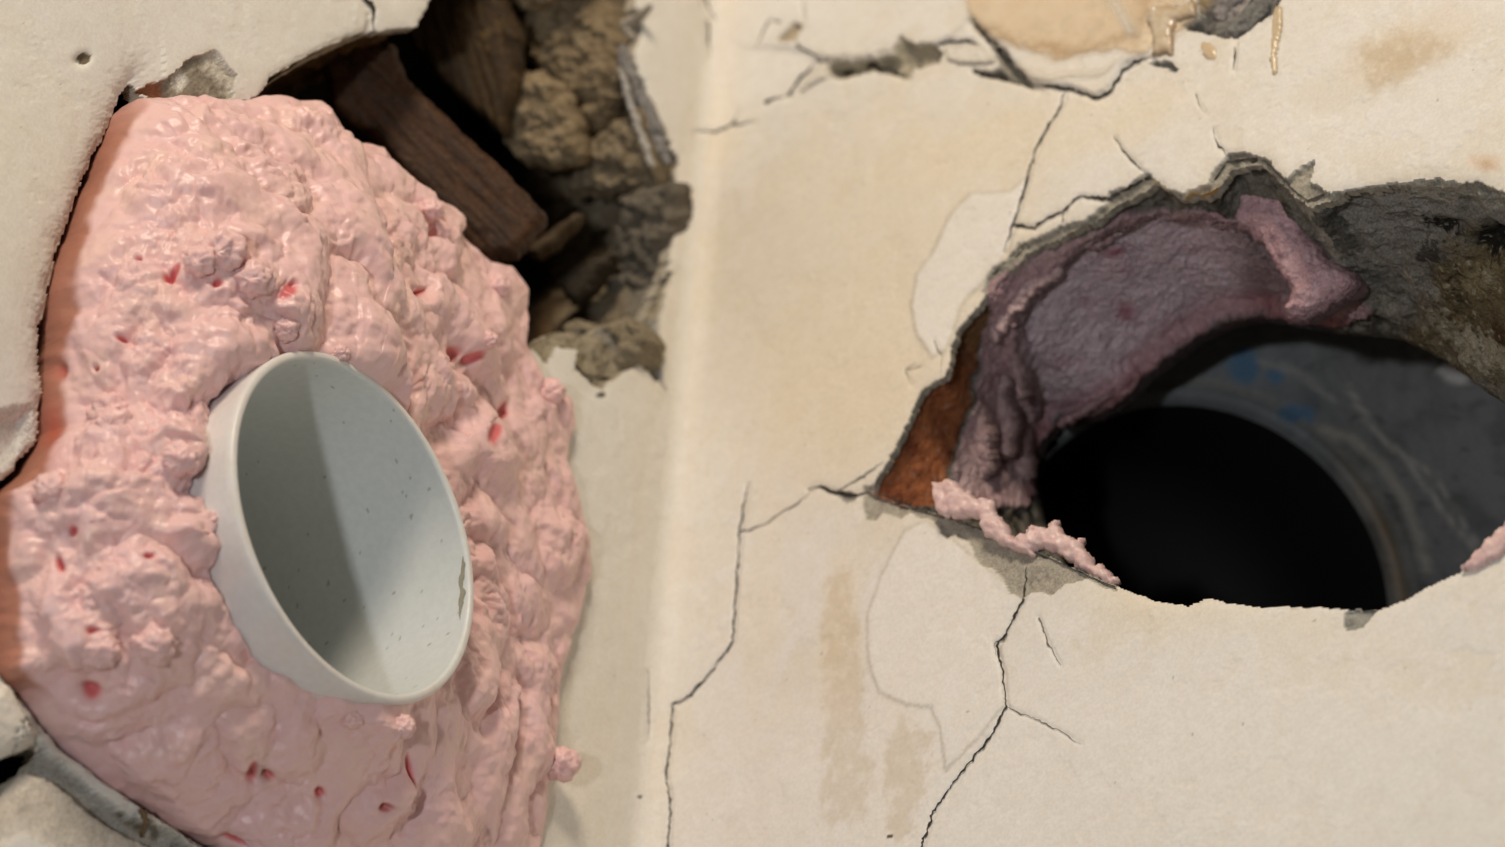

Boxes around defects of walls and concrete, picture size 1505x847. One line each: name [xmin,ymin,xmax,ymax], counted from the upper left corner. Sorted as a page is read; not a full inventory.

peeling [135,49,238,100]
spalling [254,31,674,391]
crack [703,0,909,133]
spalling [800,24,1035,92]
crack [937,20,1149,251]
water stain [967,0,1193,80]
spalling [1146,0,1281,73]
crack [905,340,942,385]
spalling [838,151,1505,599]
spalling [0,677,147,847]
crack [648,464,880,847]
crack [921,566,1079,847]